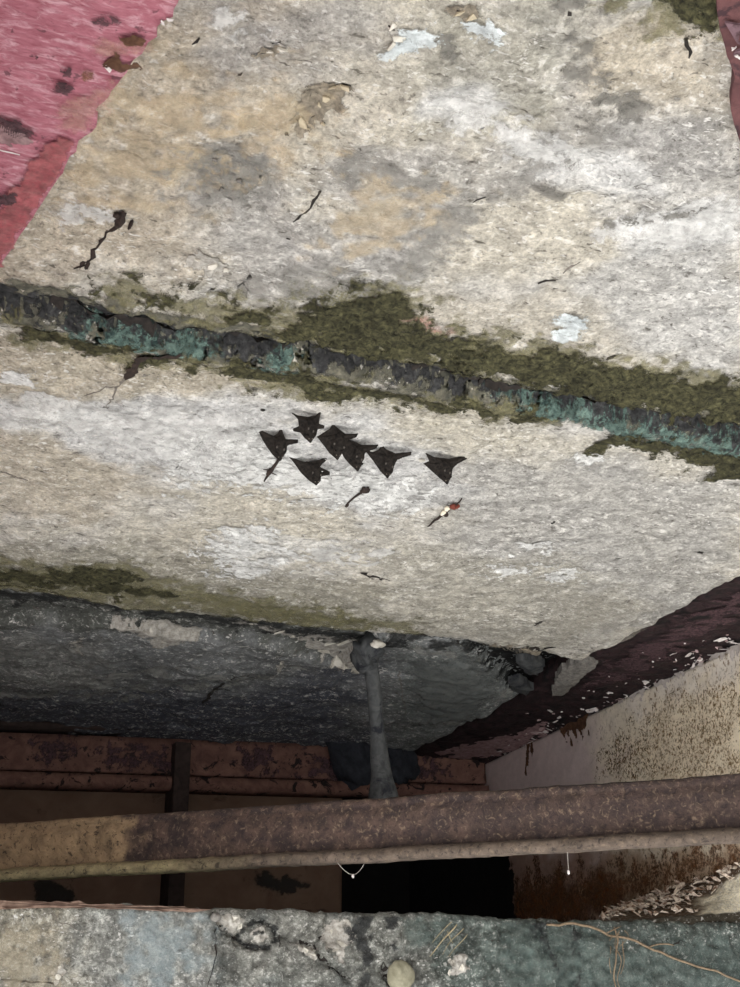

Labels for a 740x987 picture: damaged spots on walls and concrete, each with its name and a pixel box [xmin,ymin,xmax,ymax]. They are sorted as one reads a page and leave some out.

spalling [377,20,406,52]
spalling [285,82,354,139]
crack [74,210,134,270]
crack [84,354,182,406]
damp [0,275,740,456]
damp [0,368,475,525]
damp [566,452,606,475]
peeling [576,634,740,718]
rust [0,665,740,922]